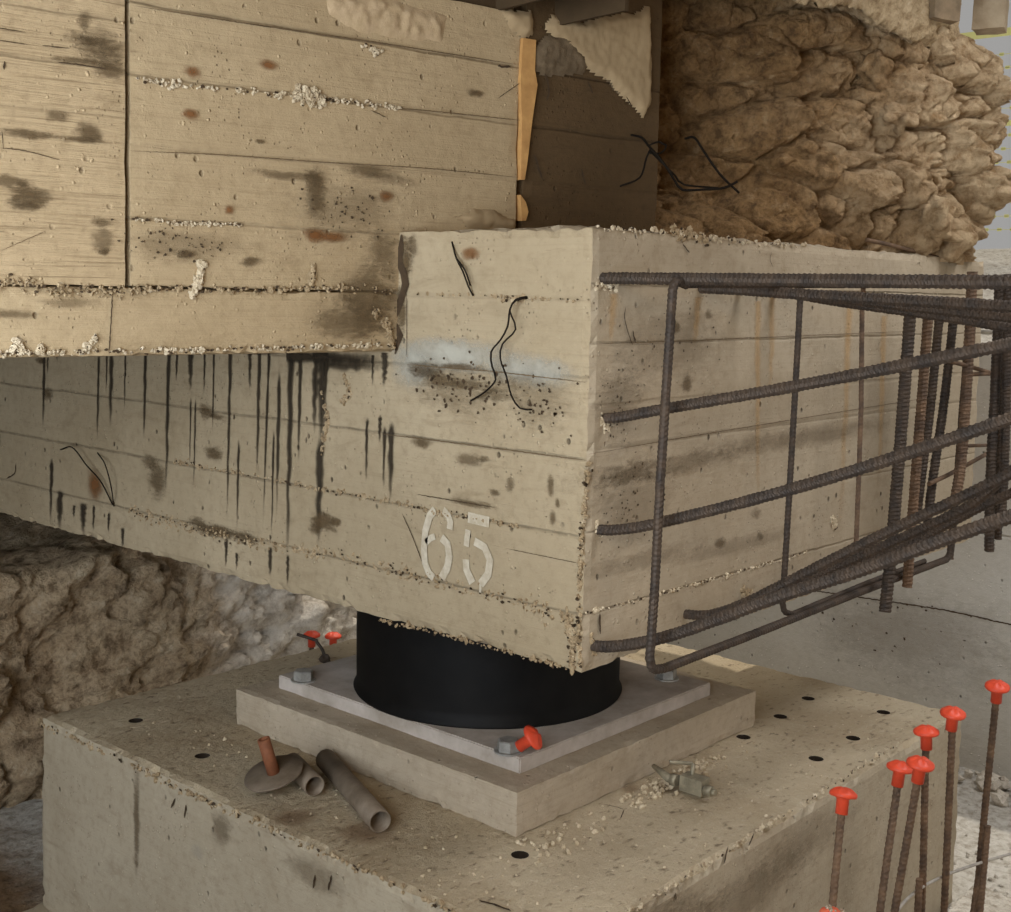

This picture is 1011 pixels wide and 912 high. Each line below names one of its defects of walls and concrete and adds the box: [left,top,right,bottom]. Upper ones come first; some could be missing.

leakage [0,176,48,208]
spalling [596,223,807,249]
leakage [37,357,50,412]
leakage [97,356,126,426]
leakage [151,354,240,510]
leakage [248,341,564,532]
leakage [50,461,95,529]
spalling [130,508,277,545]
leakage [192,519,255,566]
spalling [378,271,1011,676]
spalling [37,718,405,895]
spalling [652,705,966,912]